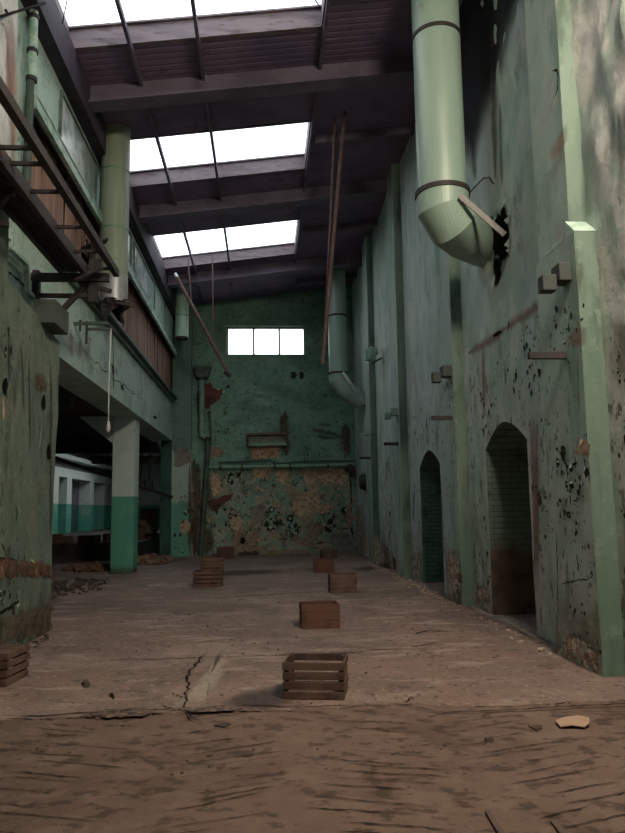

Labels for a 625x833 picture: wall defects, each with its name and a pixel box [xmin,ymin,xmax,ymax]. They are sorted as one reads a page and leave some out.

flaking render [205,382,225,411]
flaking render [251,446,290,484]
peeling [208,467,349,552]
flaking render [0,557,55,643]
crack [0,653,207,724]
crack [238,701,361,709]